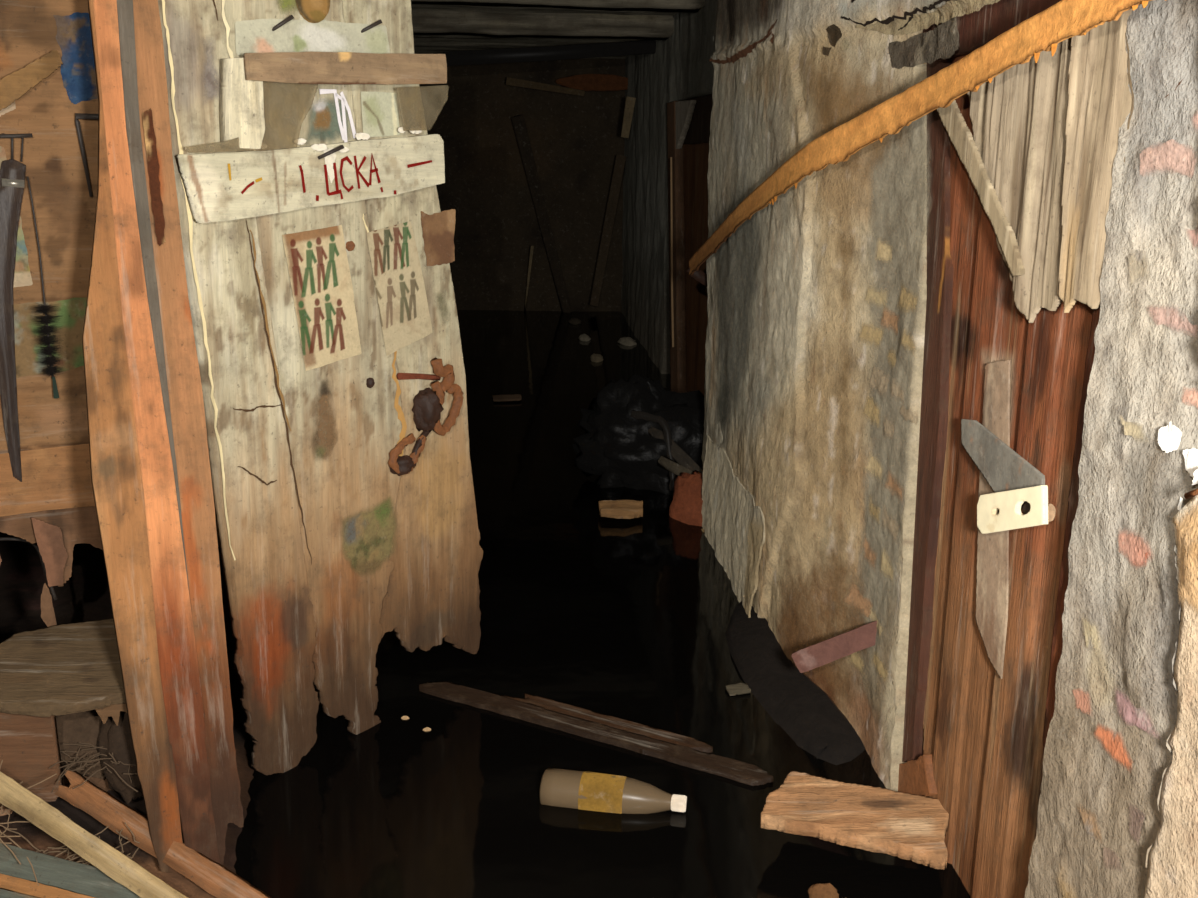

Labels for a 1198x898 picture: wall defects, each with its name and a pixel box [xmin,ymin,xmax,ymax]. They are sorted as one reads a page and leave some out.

spalling [822,0,1000,69]
spalling [1025,0,1198,898]